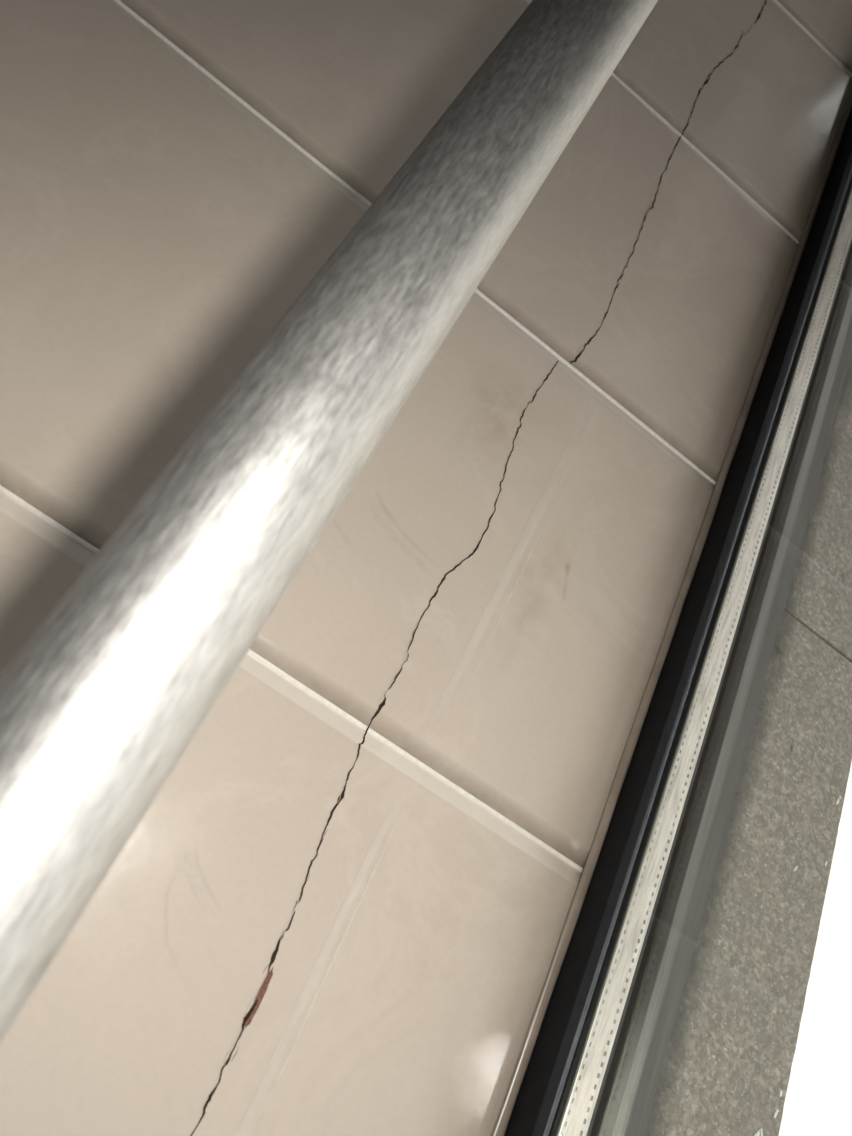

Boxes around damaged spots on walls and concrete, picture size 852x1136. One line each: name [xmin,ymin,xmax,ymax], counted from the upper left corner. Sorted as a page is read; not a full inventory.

crack [261,0,767,975]
crack [190,1008,251,1136]